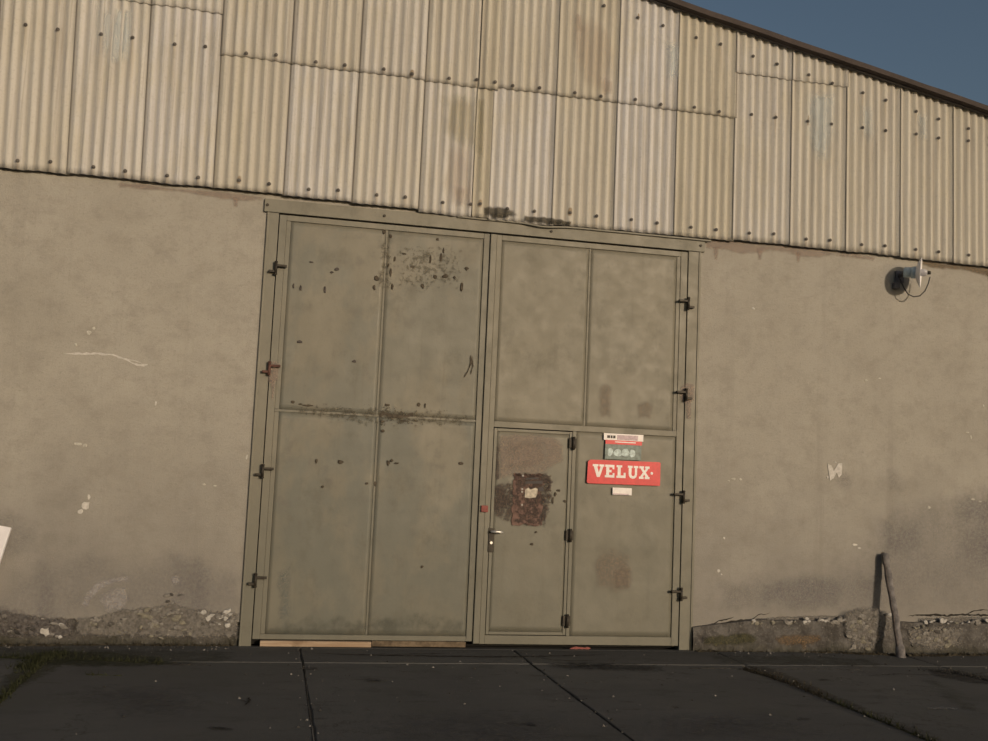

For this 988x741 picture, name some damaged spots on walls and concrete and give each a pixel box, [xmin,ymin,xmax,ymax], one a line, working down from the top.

flaking render [0,593,238,639]
crack [909,609,988,617]